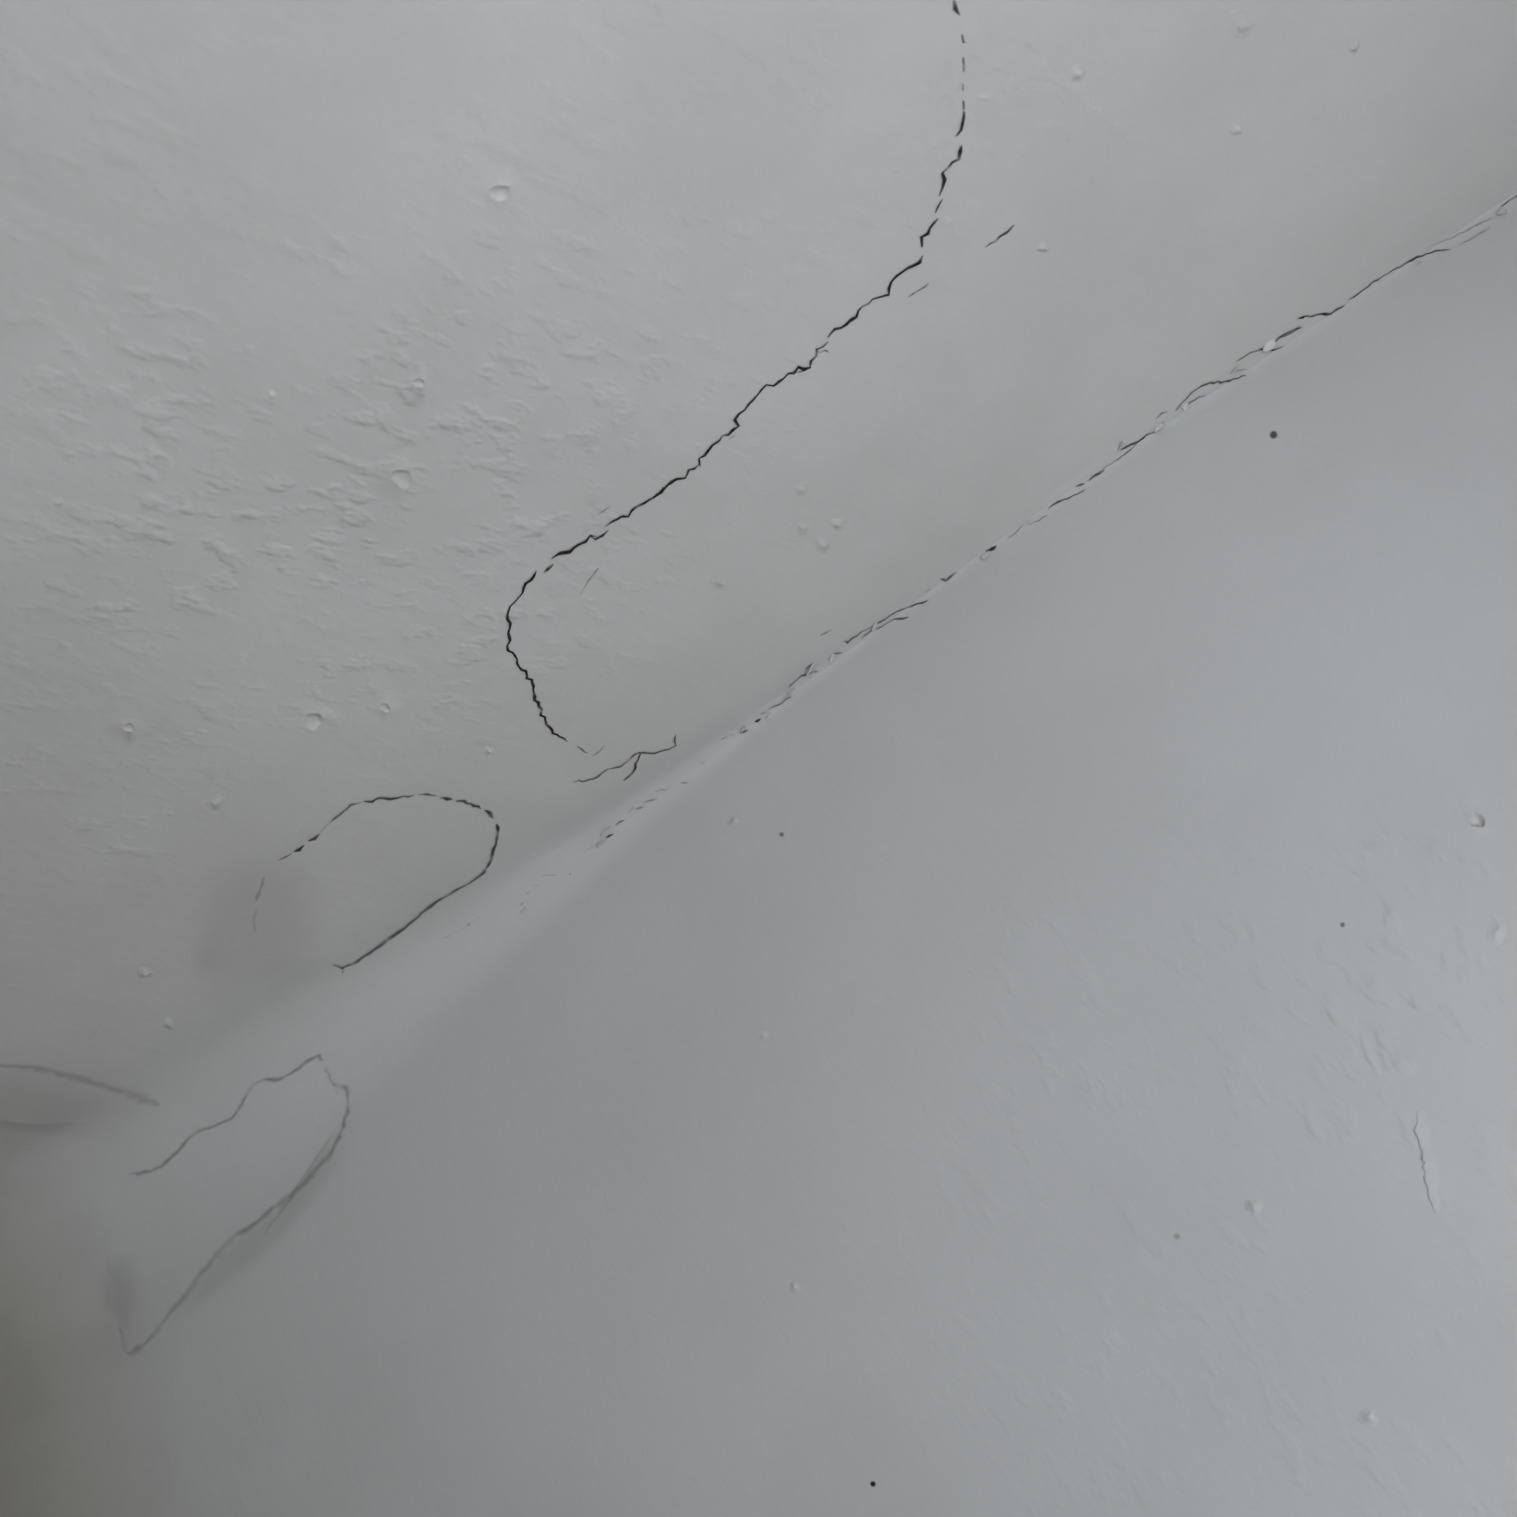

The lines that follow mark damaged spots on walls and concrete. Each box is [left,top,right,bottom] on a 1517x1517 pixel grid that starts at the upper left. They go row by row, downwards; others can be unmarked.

crack [506,2,997,741]